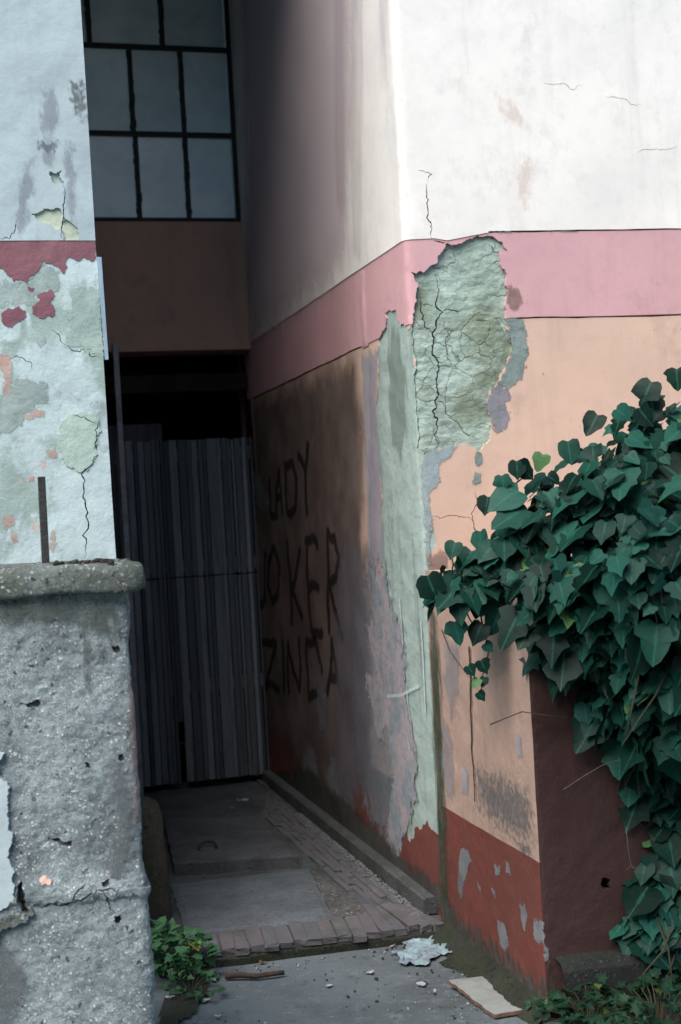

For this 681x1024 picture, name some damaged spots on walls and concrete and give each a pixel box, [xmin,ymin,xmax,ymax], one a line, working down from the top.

peeling [49,171,64,185]
peeling [32,208,79,240]
peeling [0,262,61,328]
crack [420,282,467,435]
peeling [0,353,49,434]
peeling [46,411,102,472]
crack [78,416,98,549]
peeling [365,236,529,858]
spalling [18,881,27,908]